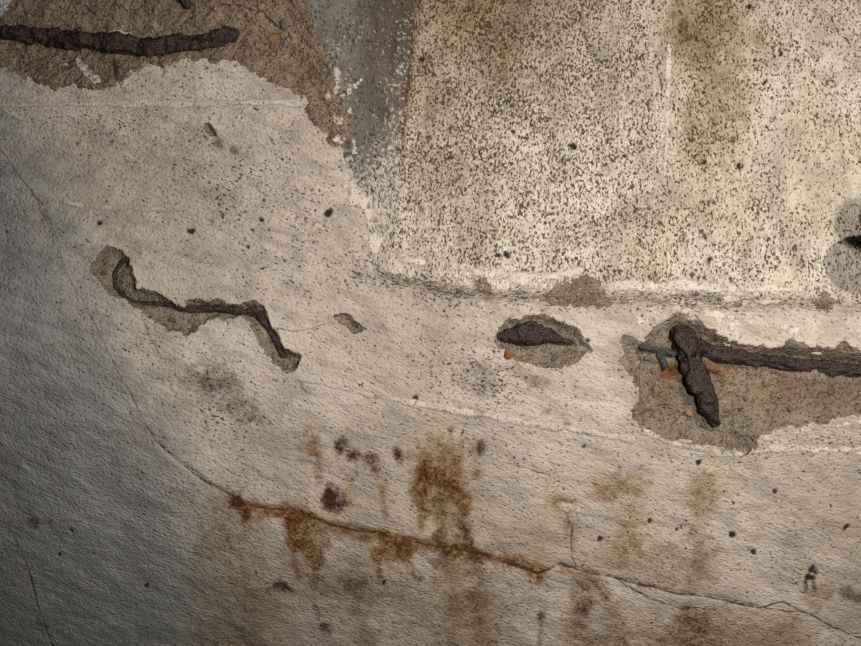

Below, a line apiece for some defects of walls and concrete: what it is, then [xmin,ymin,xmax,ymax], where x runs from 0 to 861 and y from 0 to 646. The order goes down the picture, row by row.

spalling [0,0,363,162]
spalling [89,244,302,374]
spalling [446,263,861,458]
corrosion [322,488,346,509]
crack [147,426,858,638]